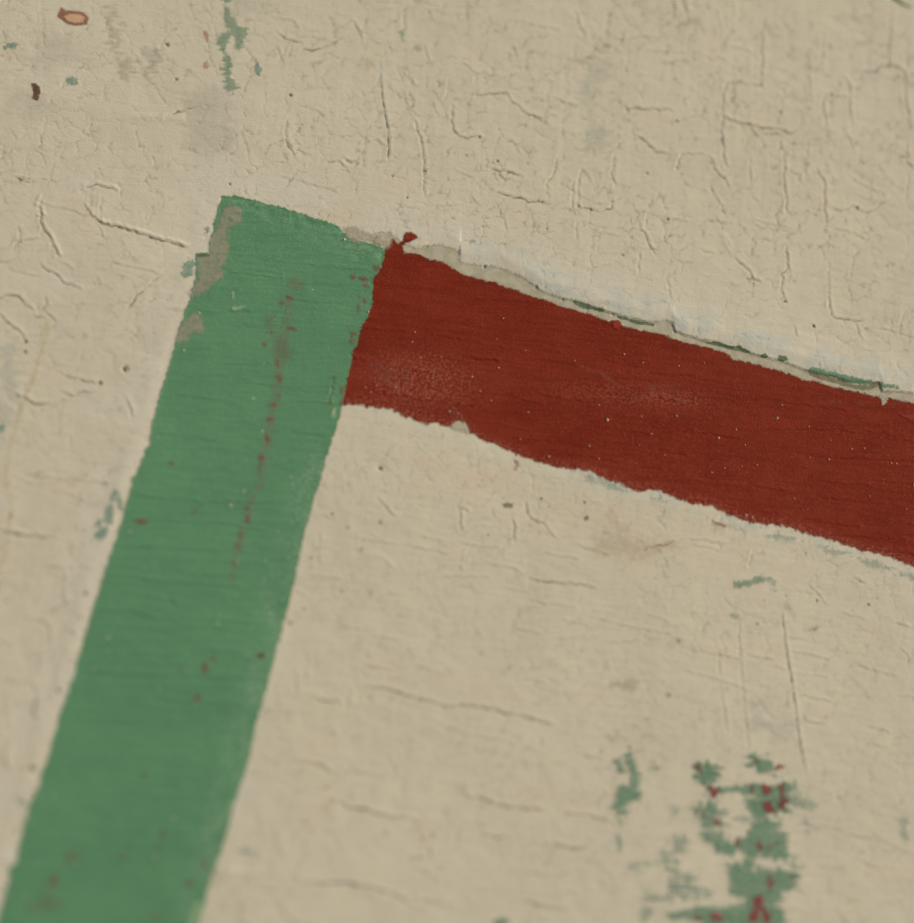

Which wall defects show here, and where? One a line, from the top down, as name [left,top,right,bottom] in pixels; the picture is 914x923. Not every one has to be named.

peeling [218,0,248,91]
peeling [181,207,241,295]
peeling [574,301,604,312]
peeling [706,342,749,353]
peeling [810,367,899,405]
peeling [610,745,644,824]